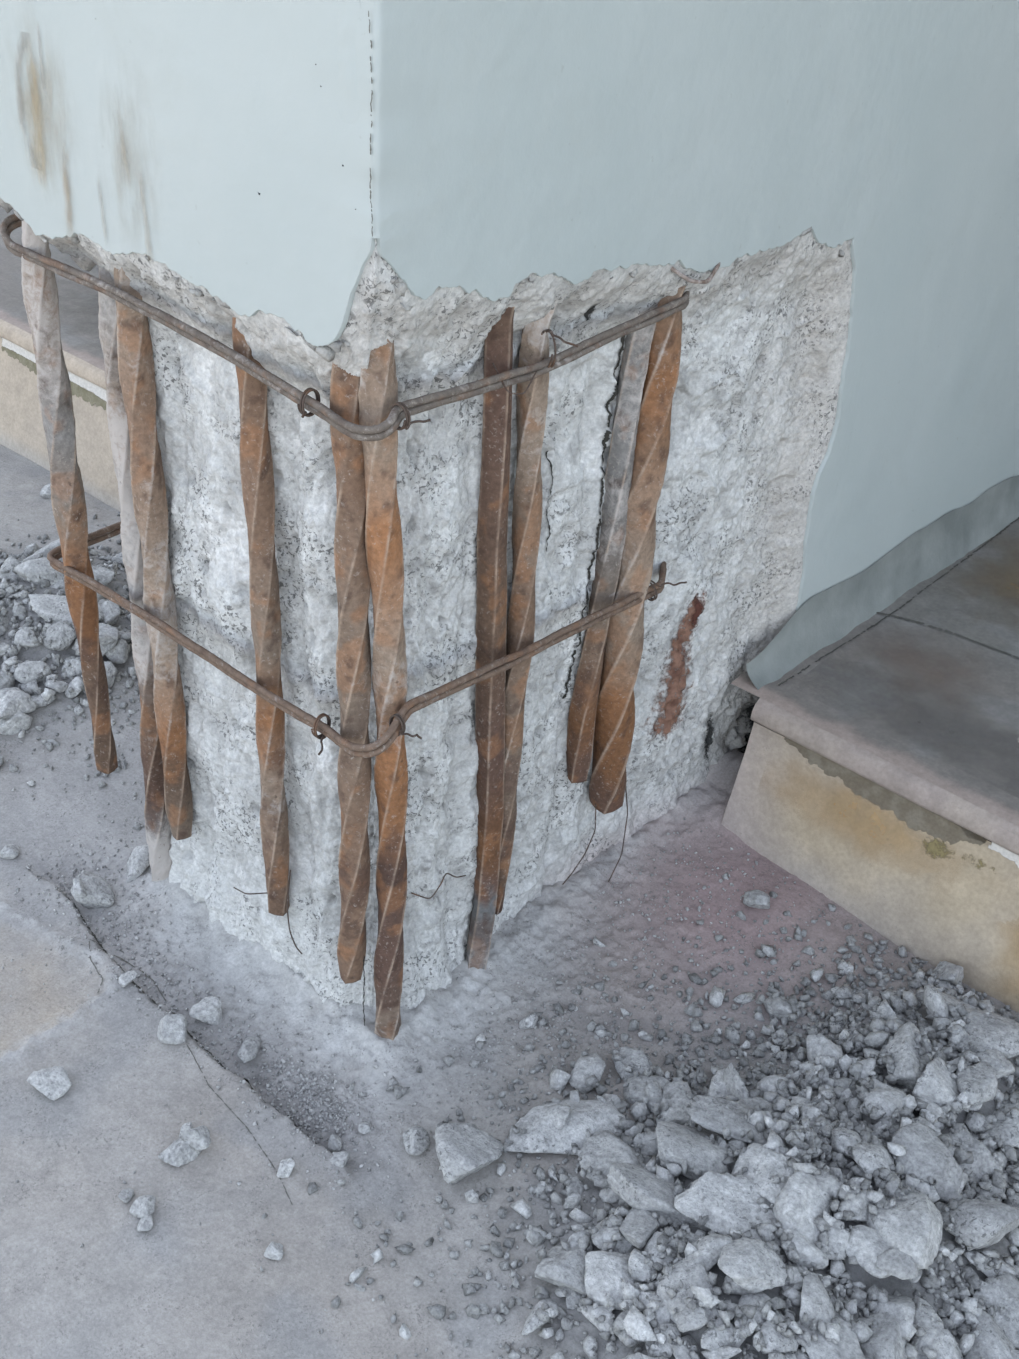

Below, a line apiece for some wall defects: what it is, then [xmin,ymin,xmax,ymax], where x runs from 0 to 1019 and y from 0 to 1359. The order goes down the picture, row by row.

spalling [0,198,24,221]
crack [366,11,374,237]
peeling [1,338,37,375]
spalling [39,226,853,1009]
rust [647,593,705,738]
crack [704,518,1019,763]
crack [67,897,316,1204]